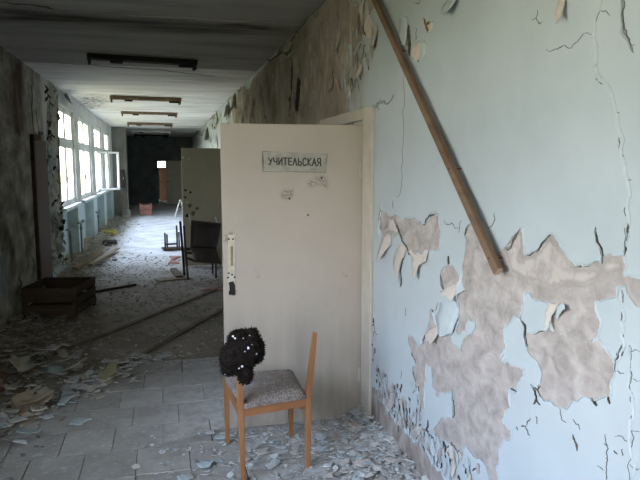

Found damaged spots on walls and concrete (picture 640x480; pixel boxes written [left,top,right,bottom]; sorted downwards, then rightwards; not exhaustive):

peeling [45,80,72,275]
peeling [204,0,380,148]
crack [359,73,405,209]
peeling [377,204,441,287]
peeling [398,15,422,63]
crack [547,0,634,257]
peeling [371,223,640,480]
crack [560,410,580,451]
crack [598,290,640,480]